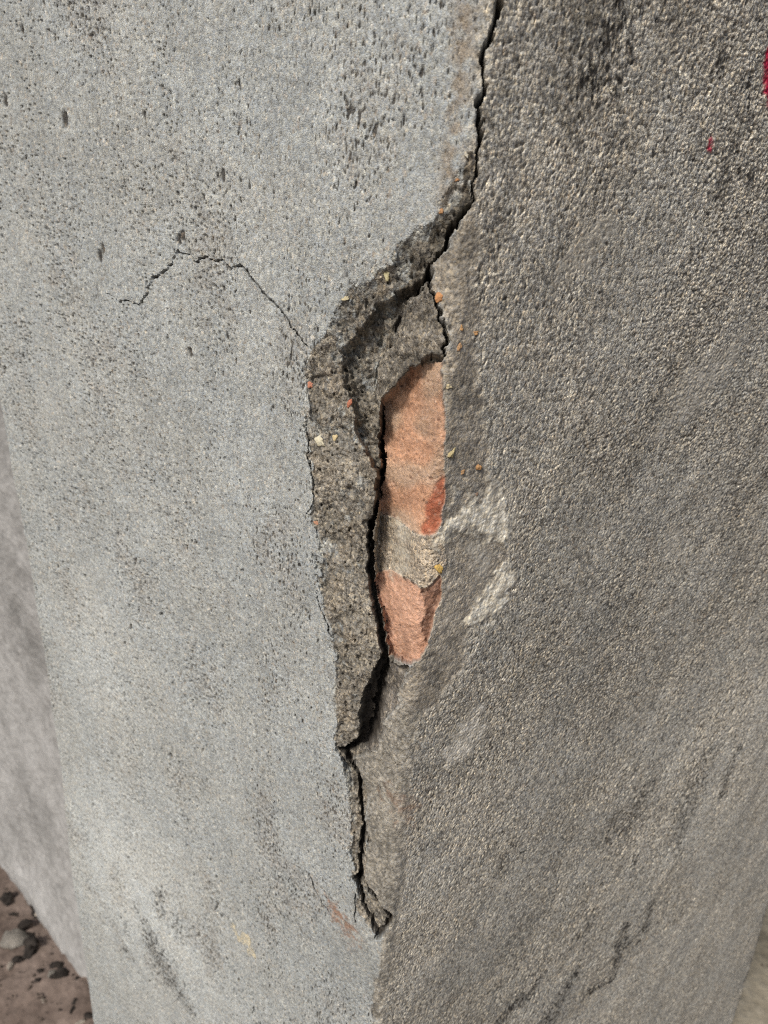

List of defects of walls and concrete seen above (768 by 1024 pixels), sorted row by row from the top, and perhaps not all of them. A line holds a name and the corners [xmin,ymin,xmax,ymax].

crack [106,249,309,348]
crack [305,423,315,515]
crack [309,400,394,940]
spalling [302,150,516,933]
crack [394,0,505,361]